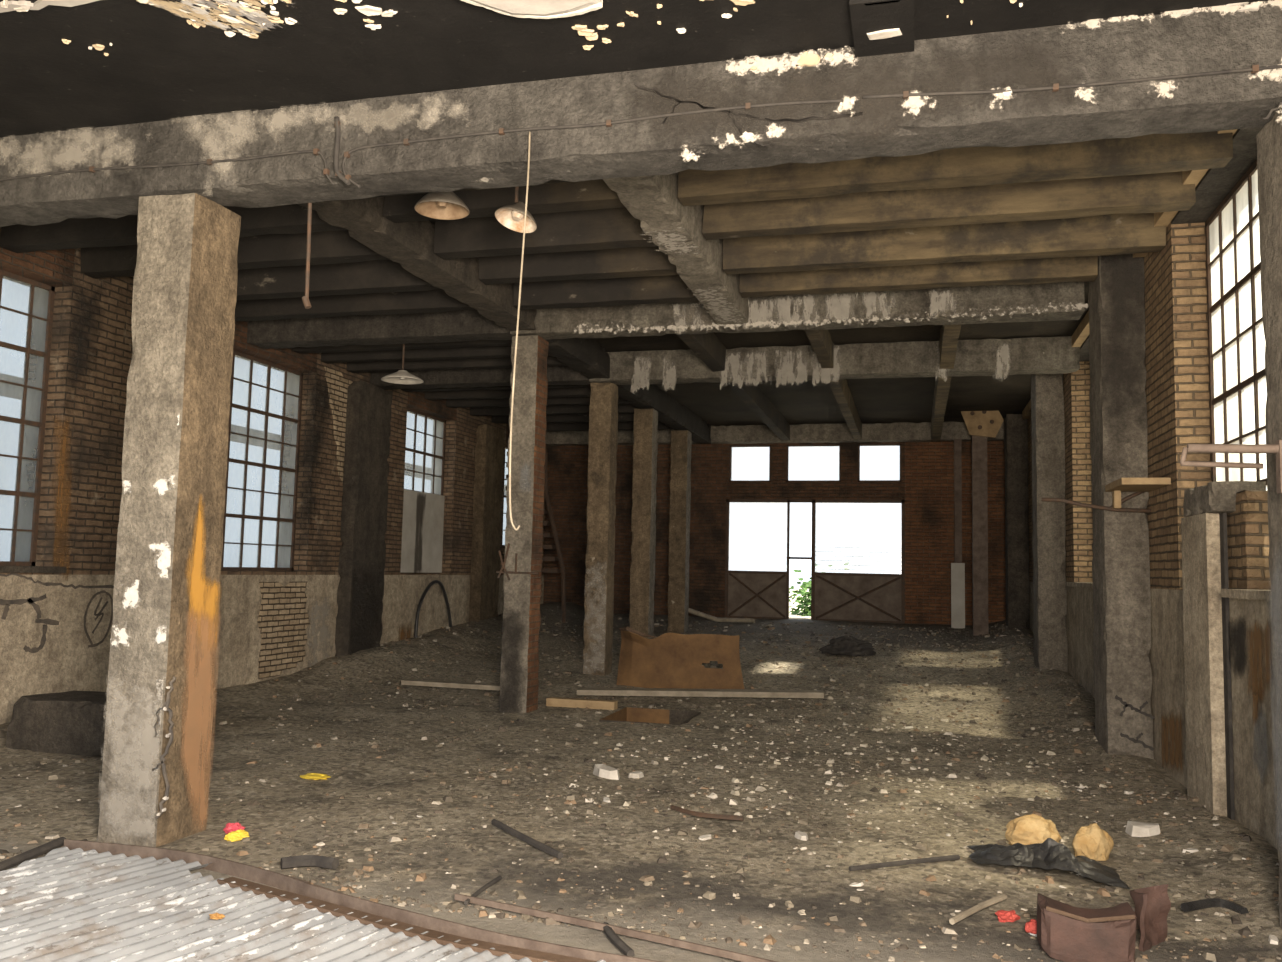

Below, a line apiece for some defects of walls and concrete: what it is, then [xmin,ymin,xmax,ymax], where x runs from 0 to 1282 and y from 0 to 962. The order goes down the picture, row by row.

flaking render [0,0,99,13]
peeling [136,0,297,39]
peeling [334,0,398,30]
flaking render [461,0,638,50]
peeling [722,0,755,18]
spalling [726,46,857,76]
spalling [835,96,857,116]
spalling [901,90,936,116]
peeling [574,287,1088,334]
corrosion [182,505,218,827]
corrosion [1248,620,1272,722]
crack [1115,695,1155,751]